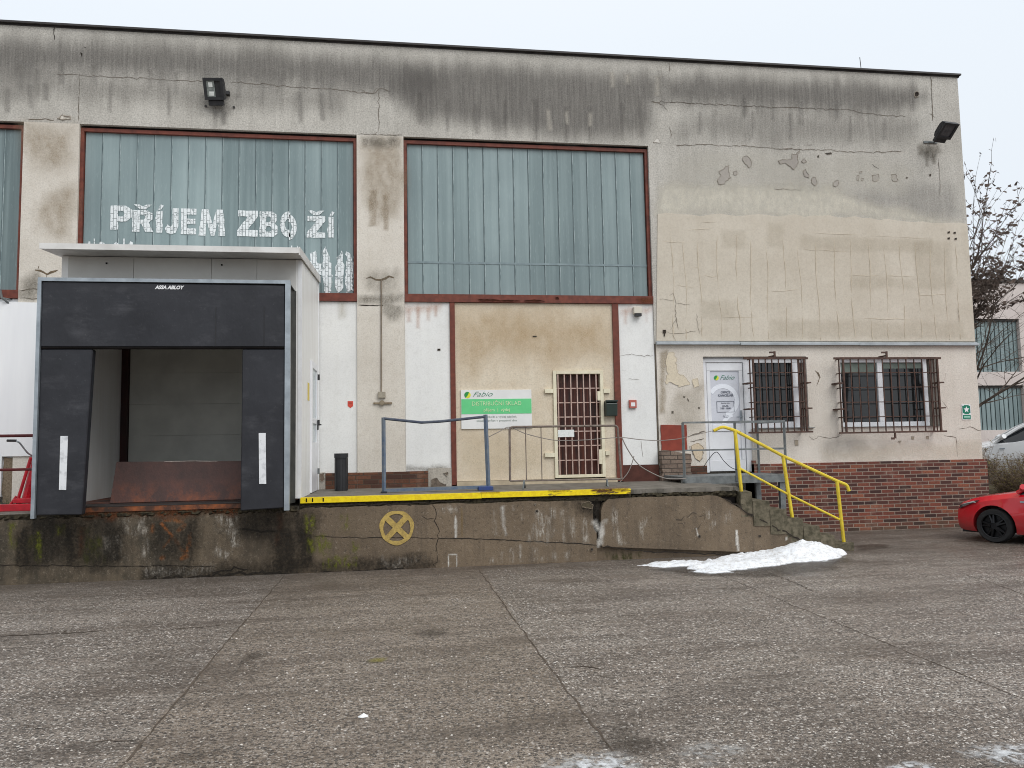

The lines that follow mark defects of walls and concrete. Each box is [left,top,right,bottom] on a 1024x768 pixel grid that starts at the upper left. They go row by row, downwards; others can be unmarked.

leakage [0,44,915,132]
crack [652,100,902,169]
peeling [717,156,752,185]
peeling [778,150,832,186]
peeling [661,351,700,414]
leakage [142,511,431,580]
crack [241,498,800,563]